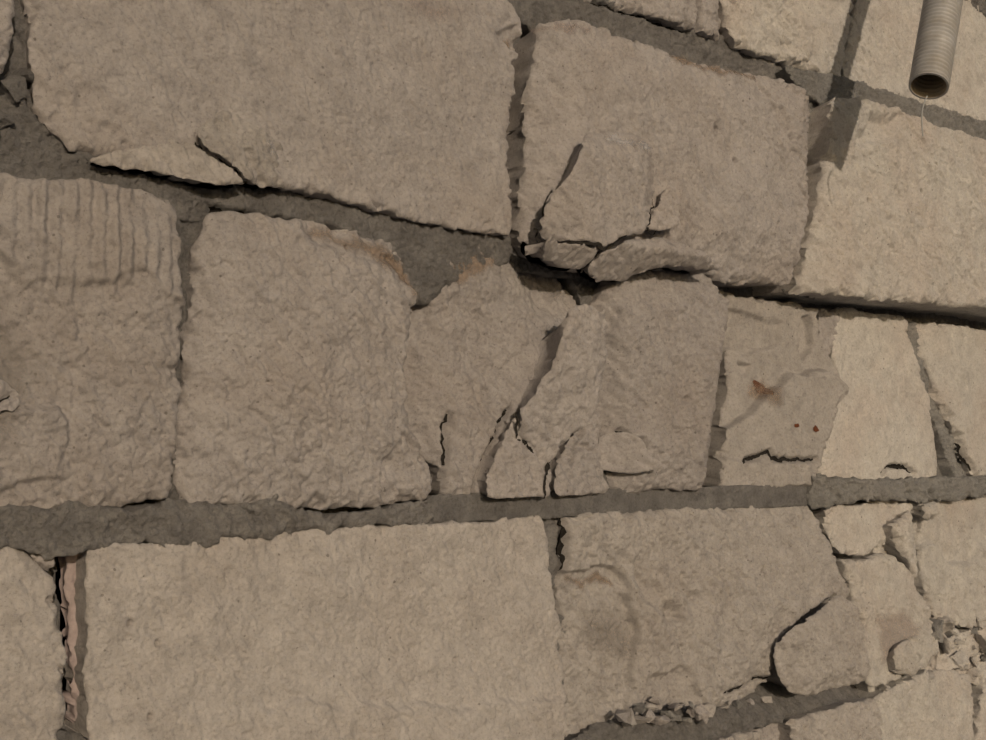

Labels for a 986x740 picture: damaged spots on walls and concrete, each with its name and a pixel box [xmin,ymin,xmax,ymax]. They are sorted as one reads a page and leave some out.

crack [195,142,248,183]
crack [208,206,244,214]
crack [534,199,656,273]
corrosion [750,380,779,400]
crack [439,414,448,465]
crack [480,409,550,499]
crack [742,450,813,464]
crack [880,464,911,473]
crack [953,438,971,471]
crack [556,518,567,571]
crack [724,676,768,693]